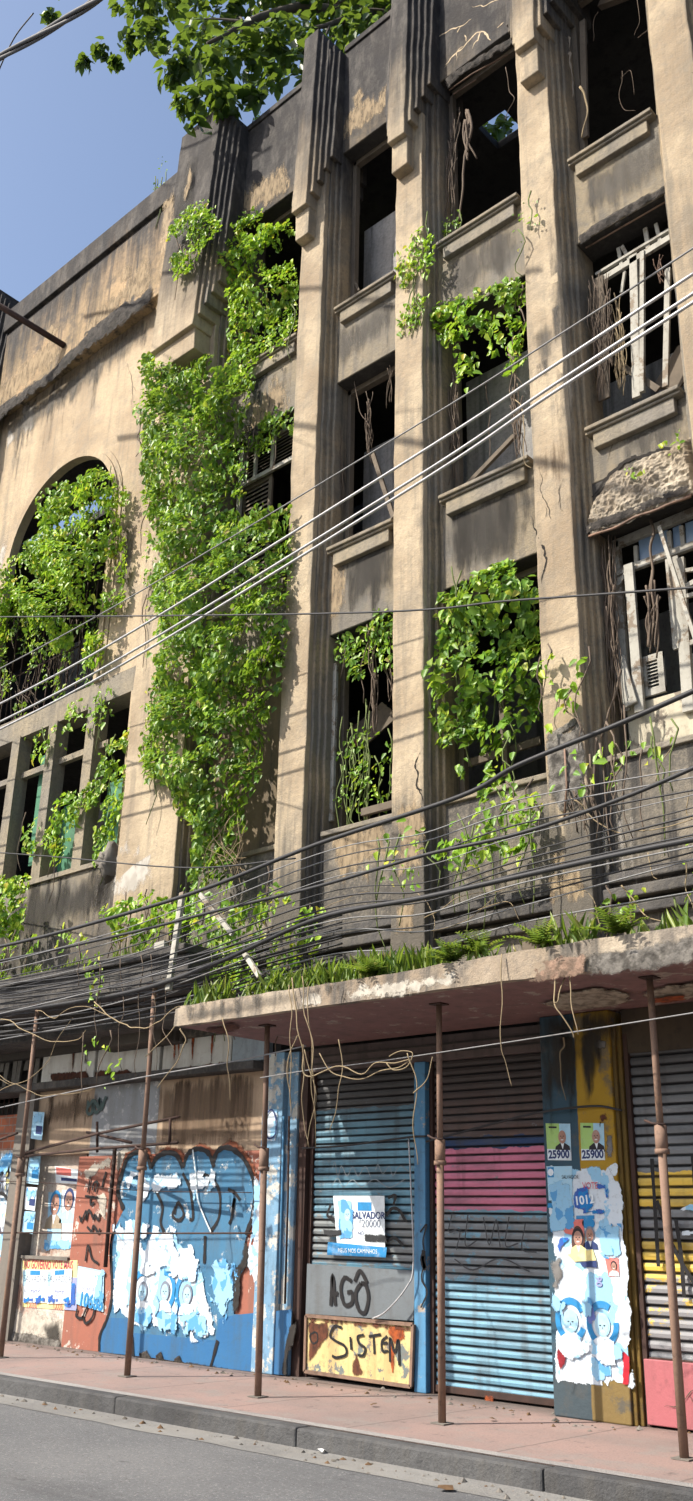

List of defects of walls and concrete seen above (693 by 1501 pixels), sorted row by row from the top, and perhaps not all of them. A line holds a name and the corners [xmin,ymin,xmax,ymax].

crack [439,0,502,67]
peeling [343,88,386,139]
spalling [529,935,693,1011]